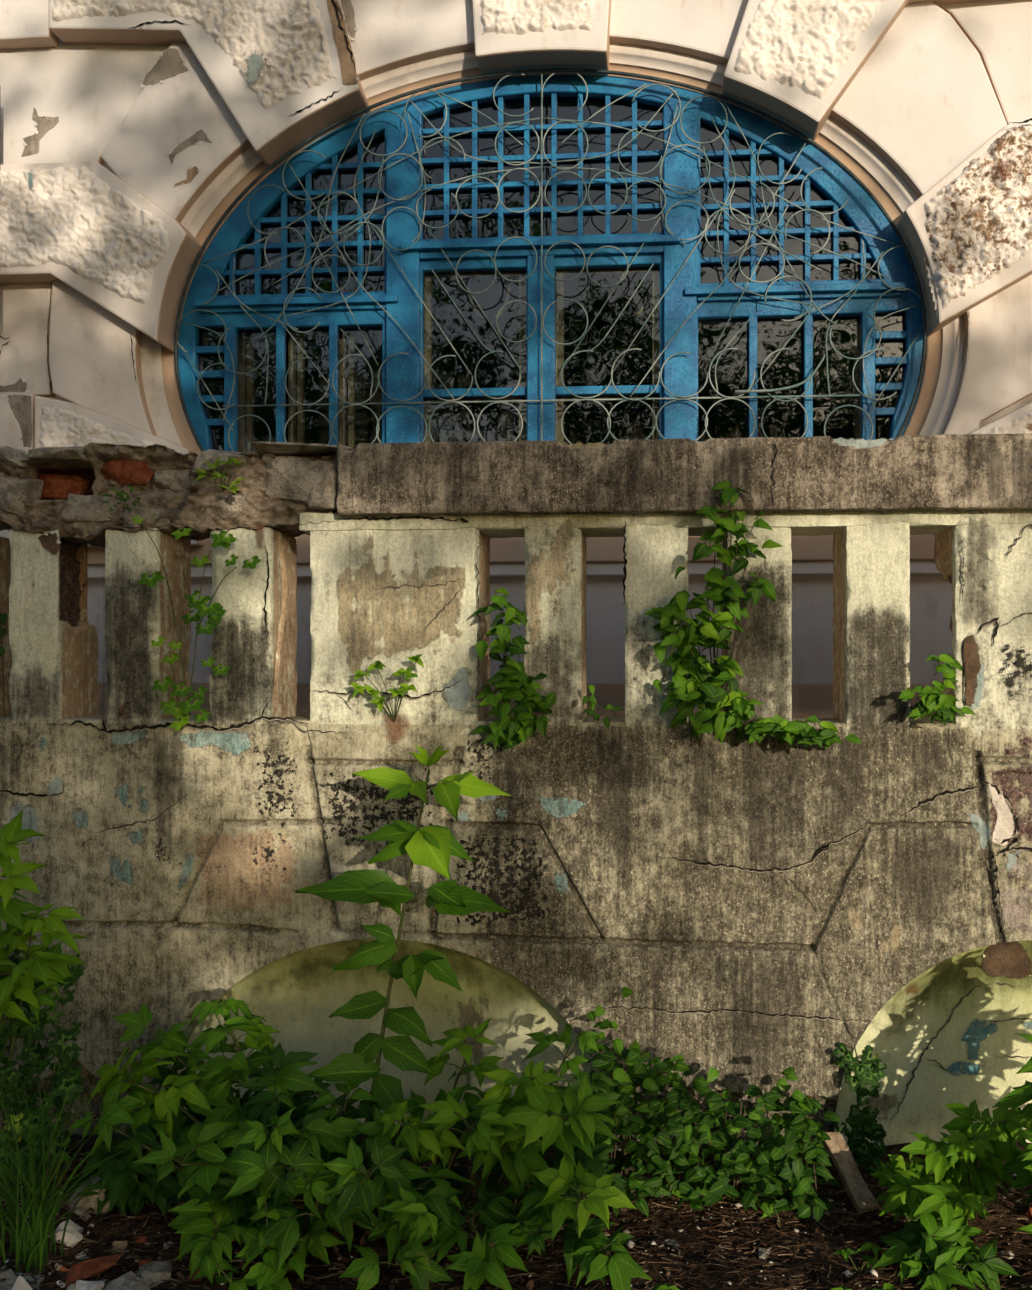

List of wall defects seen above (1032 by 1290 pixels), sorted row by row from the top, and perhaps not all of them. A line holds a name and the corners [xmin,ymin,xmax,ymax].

crack [289,0,355,116]
peeling [21,108,59,157]
spalling [0,378,353,555]
crack [49,516,481,735]
damp [737,576,787,720]
damp [852,612,905,722]
spalling [963,635,986,710]
crack [977,612,1032,648]
damp [250,741,302,883]
damp [317,770,433,855]
crack [899,779,1032,941]
flaking render [969,773,1032,979]